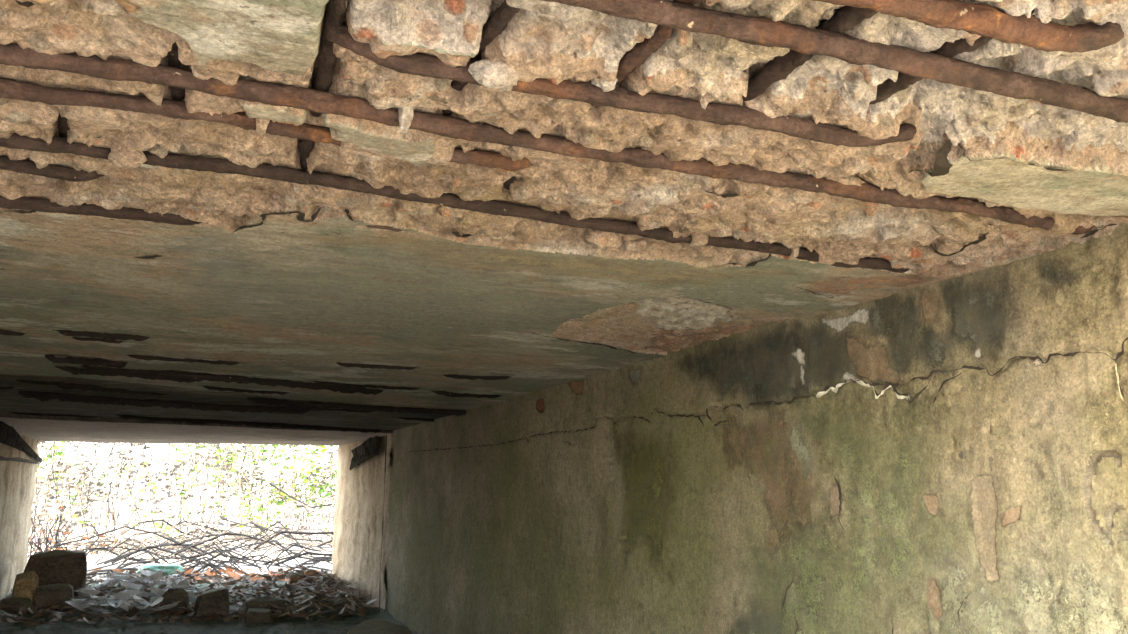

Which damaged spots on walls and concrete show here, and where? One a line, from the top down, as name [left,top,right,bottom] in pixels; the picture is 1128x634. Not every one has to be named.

spalling [0,0,1128,279]
spalling [552,296,796,355]
damp [645,270,1009,404]
damp [1041,260,1075,287]
crack [379,338,1128,613]
damp [788,424,812,467]